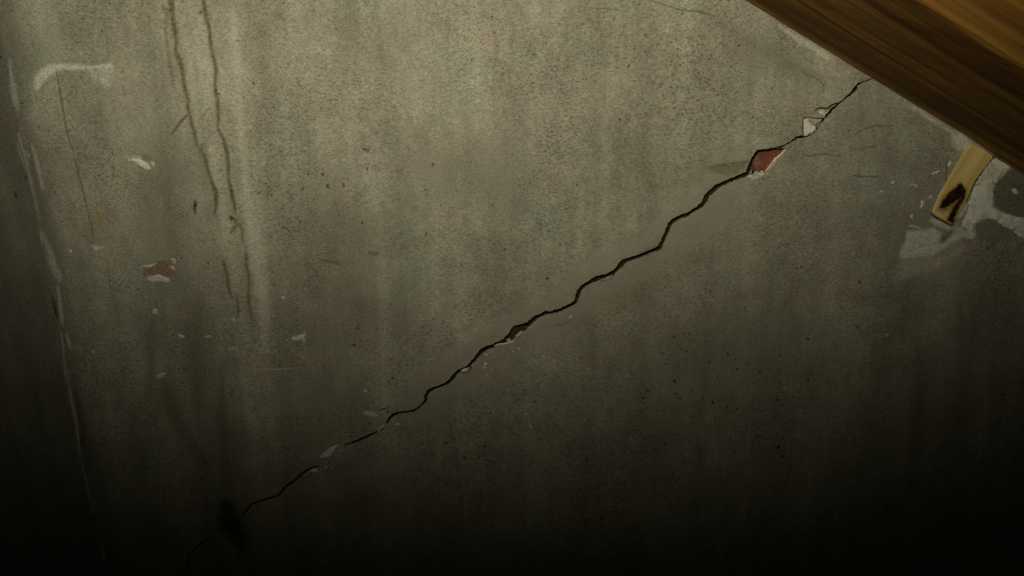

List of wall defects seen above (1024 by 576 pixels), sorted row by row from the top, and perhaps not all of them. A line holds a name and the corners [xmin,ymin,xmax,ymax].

spalling [802,110,827,136]
spalling [747,148,787,181]
peeling [141,258,176,283]
crack [344,71,872,446]
crack [242,465,320,515]